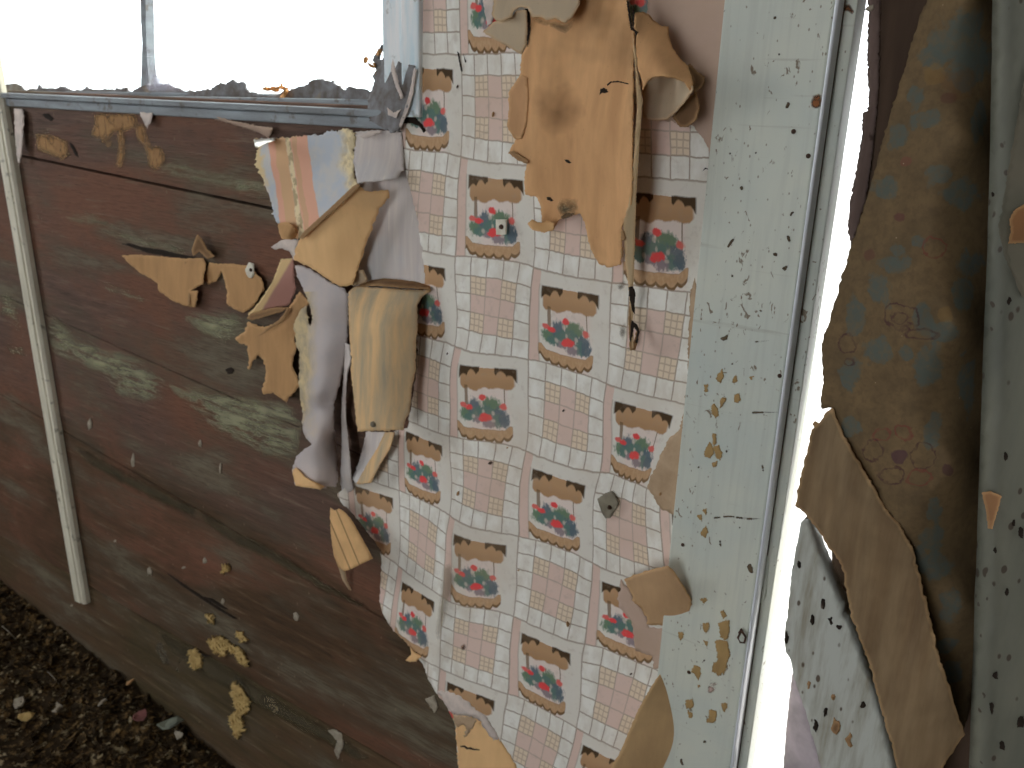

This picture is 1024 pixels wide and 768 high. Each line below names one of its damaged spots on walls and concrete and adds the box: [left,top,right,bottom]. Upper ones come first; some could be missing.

peeling [507,0,705,351]
peeling [292,265,431,492]
peeling [704,363,754,418]
peeling [698,433,727,468]
peeling [624,566,707,626]
peeling [810,599,842,630]
peeling [685,610,730,718]
peeling [452,714,516,768]
peeling [611,674,683,768]
peeling [706,703,728,723]
peeling [813,694,853,748]